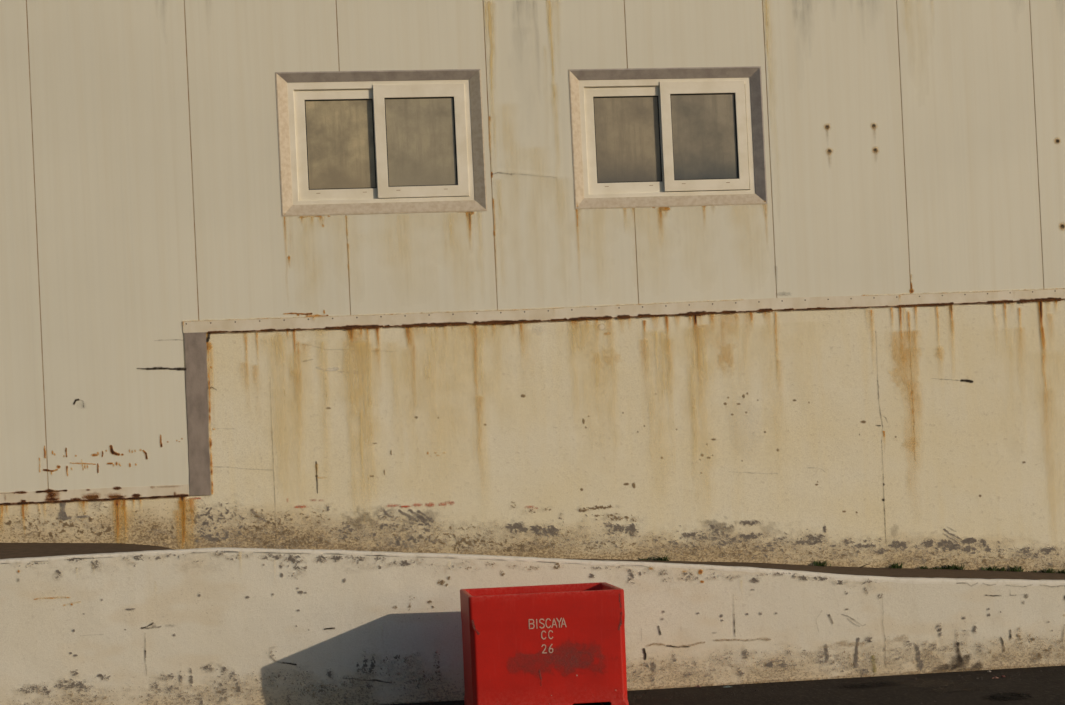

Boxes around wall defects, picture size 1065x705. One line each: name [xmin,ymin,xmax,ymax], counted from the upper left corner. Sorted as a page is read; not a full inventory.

corrosion [206,283,1063,423]
corrosion [39,445,148,476]
corrosion [0,487,194,545]
damp [383,509,434,525]
damp [905,642,995,674]